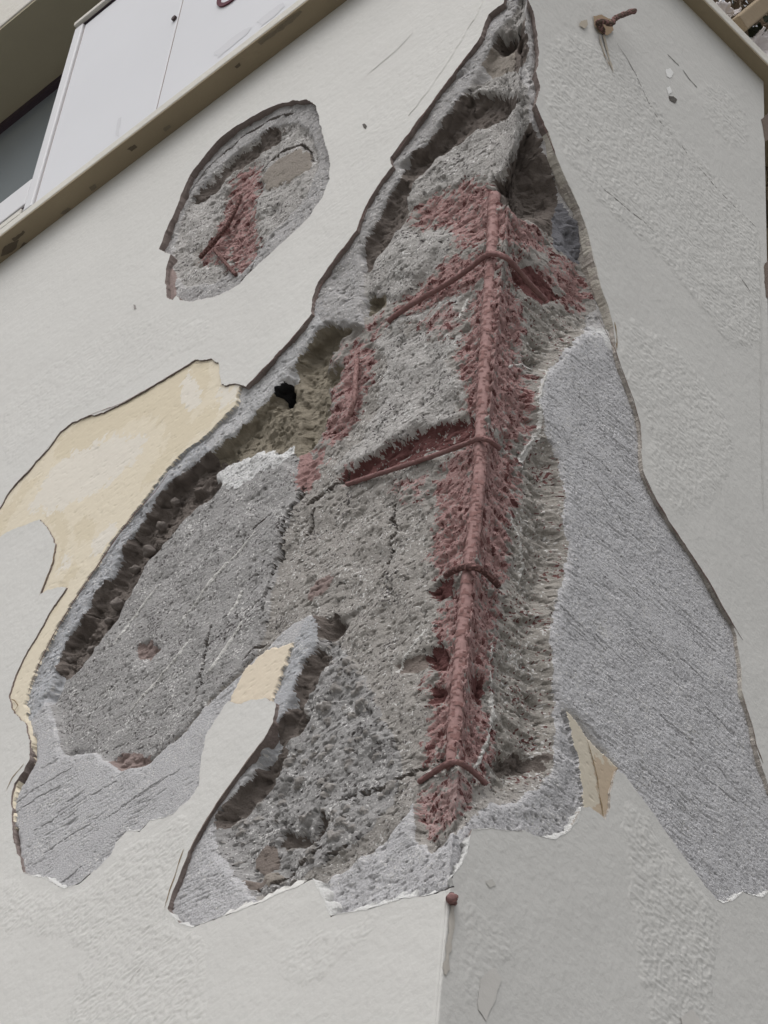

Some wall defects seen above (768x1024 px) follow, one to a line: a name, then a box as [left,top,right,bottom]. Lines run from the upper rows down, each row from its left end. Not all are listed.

spalling [666,68,677,103]
rust [190,159,268,278]
spalling [0,0,618,927]
rust [293,171,597,844]
spalling [717,891,768,903]